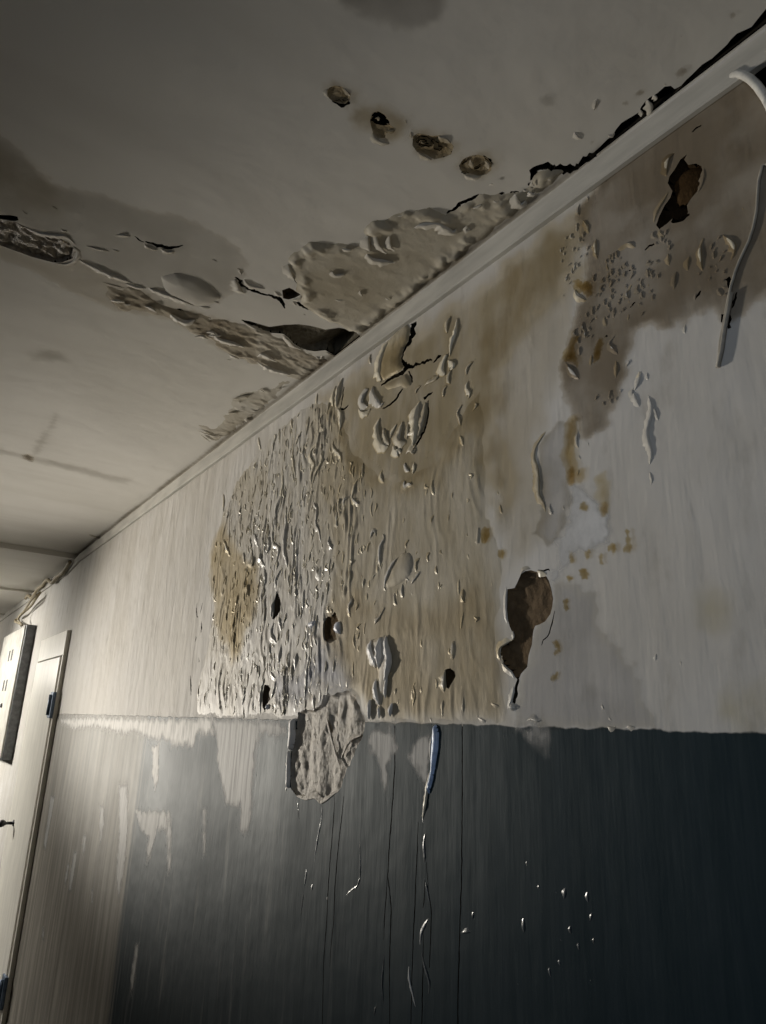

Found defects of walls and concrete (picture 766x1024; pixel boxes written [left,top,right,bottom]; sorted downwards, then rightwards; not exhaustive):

hole [322,86,351,108]
hole [370,111,454,161]
spalling [459,155,493,181]
peeling [0,210,360,442]
peeling [559,153,737,405]
crack [381,322,441,446]
peeling [197,316,555,819]
efflorescence [552,486,609,580]
damp [116,785,128,895]